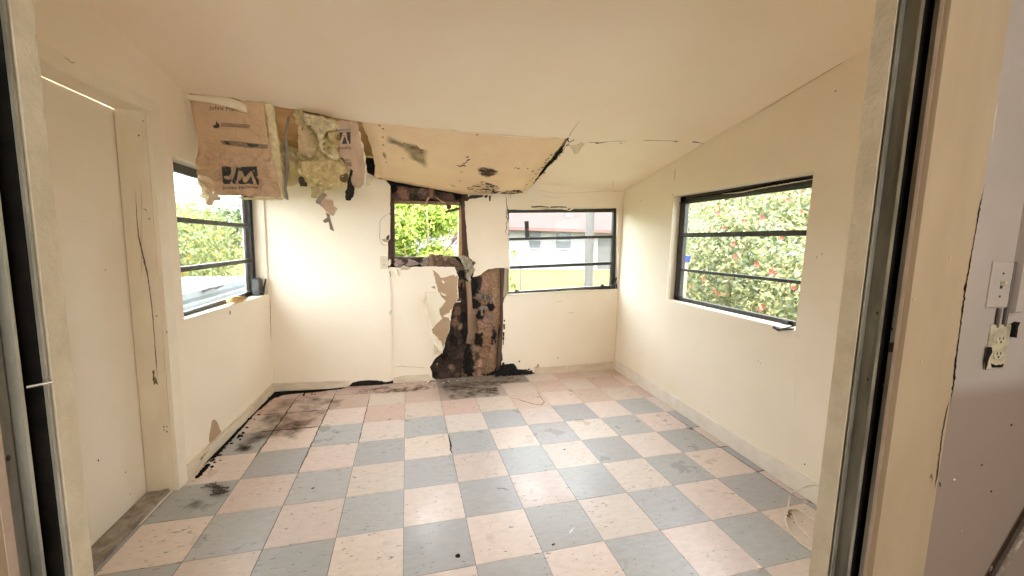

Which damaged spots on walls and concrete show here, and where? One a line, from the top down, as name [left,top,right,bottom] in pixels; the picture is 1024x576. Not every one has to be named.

water stain [391,140,424,162]
water stain [449,154,552,201]
crack [501,140,699,345]
spalling [422,268,520,379]
peeling [200,389,271,460]
water stain [206,388,343,463]